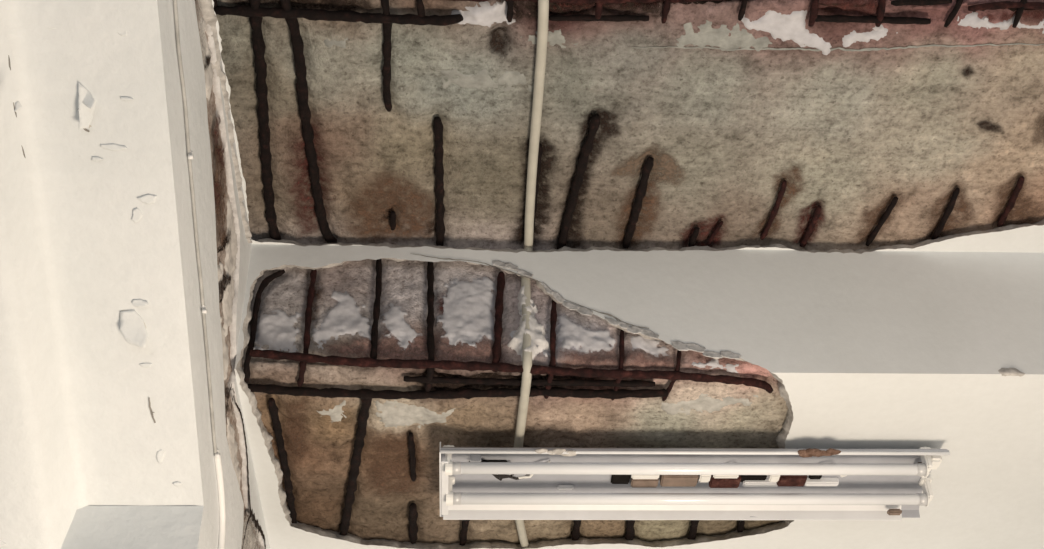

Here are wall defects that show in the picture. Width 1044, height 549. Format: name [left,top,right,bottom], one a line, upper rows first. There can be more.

corrosion [500,0,663,20]
corrosion [490,28,509,54]
spalling [198,0,1044,254]
corrosion [978,121,1001,132]
corrosion [213,116,231,249]
corrosion [514,139,556,242]
corrosion [559,109,620,248]
corrosion [993,177,1041,225]
corrosion [683,216,724,248]
corrosion [218,275,231,299]
spalling [195,0,794,549]
corrosion [331,334,675,391]